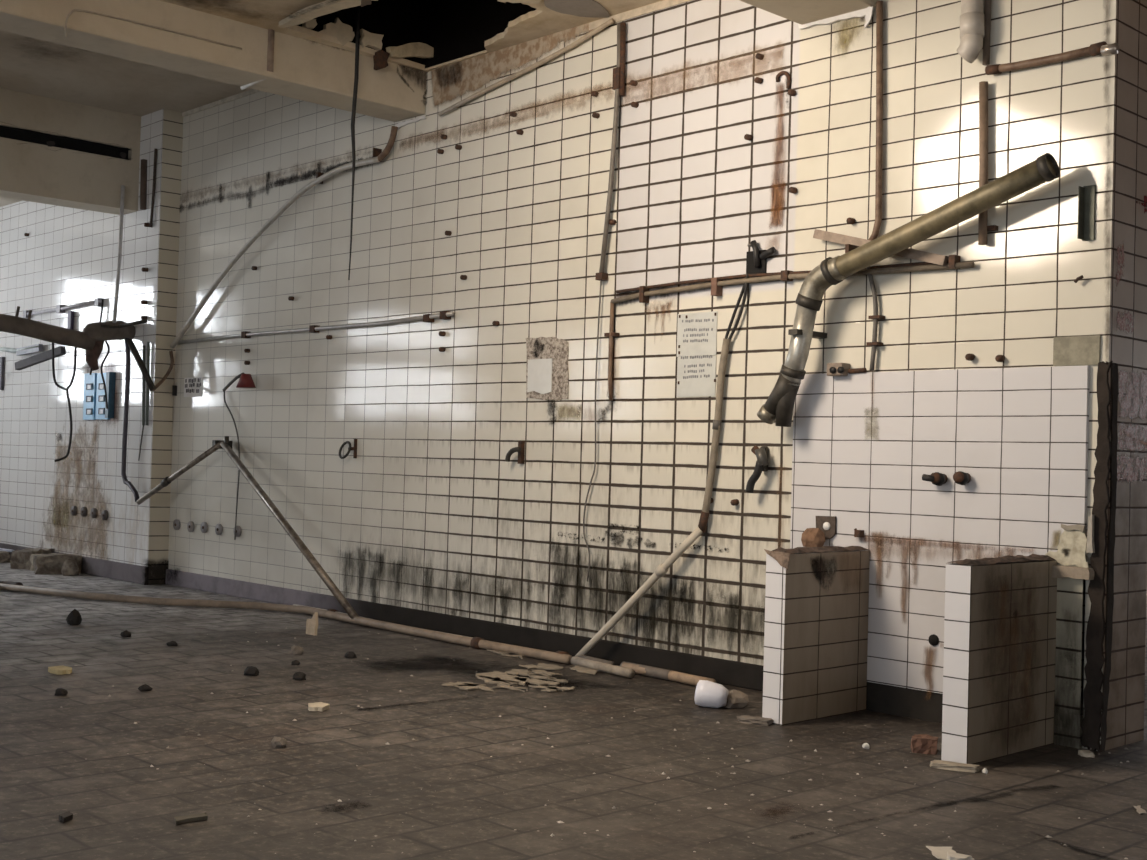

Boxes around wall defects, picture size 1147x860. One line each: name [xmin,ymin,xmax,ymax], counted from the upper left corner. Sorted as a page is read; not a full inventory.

spalling [278,0,434,70]
flaking render [497,0,609,18]
corrosion [772,71,791,224]
peeling [526,337,569,401]
spalling [1047,314,1118,752]
damp [345,551,401,603]
damp [555,548,691,642]
damp [728,596,750,646]
corrosion [859,533,980,620]
corrosion [925,648,933,692]